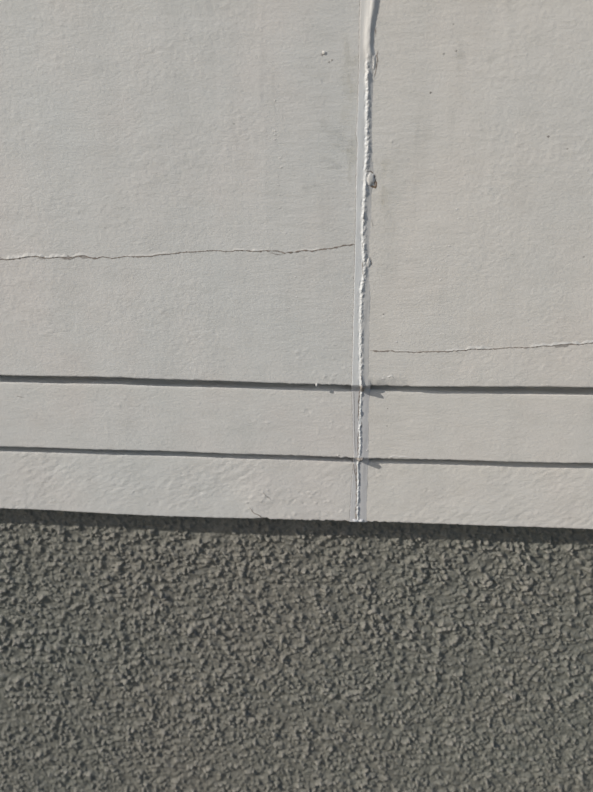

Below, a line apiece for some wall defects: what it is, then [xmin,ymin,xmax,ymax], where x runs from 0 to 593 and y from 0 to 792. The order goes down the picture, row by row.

crack [0,1,593,520]